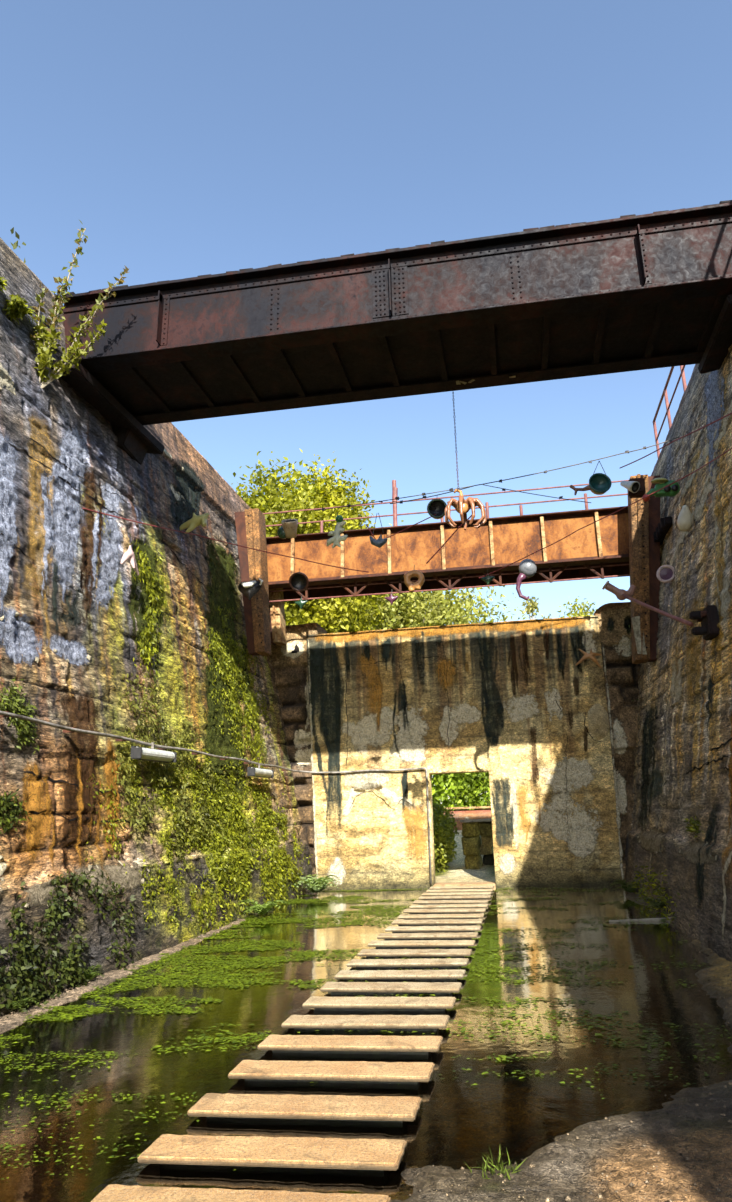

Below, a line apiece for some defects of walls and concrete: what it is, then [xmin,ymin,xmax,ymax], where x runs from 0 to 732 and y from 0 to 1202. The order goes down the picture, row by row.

leakage [170,458,204,530]
leakage [0,428,164,666]
leakage [305,638,410,885]
peeling [341,703,481,768]
leakage [414,636,442,688]
leakage [476,633,505,757]
leakage [492,773,519,874]
leakage [535,627,587,679]
peeling [535,757,604,858]
leakage [602,616,631,879]